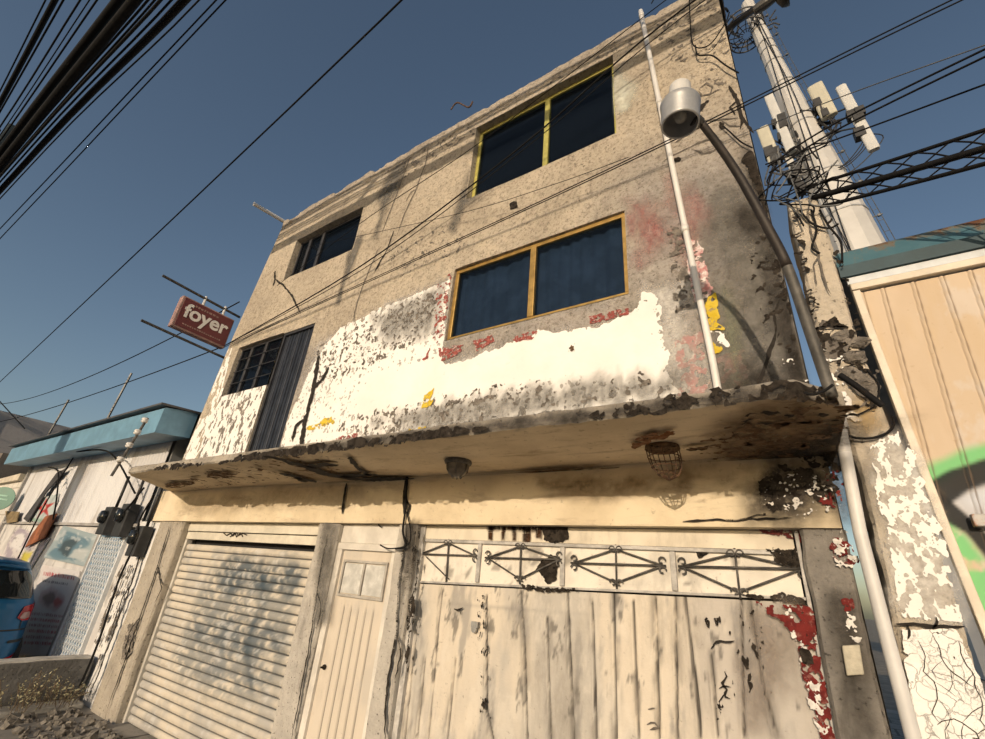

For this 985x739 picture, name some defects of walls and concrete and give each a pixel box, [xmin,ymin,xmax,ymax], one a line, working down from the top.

spalling [741,151,768,215]
peeling [154,216,881,518]
leakage [519,466,593,489]
peeling [759,529,802,543]
peeling [740,594,836,739]
leakage [719,406,863,524]
peeling [829,530,860,568]
peeling [841,598,862,643]
peeling [870,431,985,739]
crack [896,617,985,739]